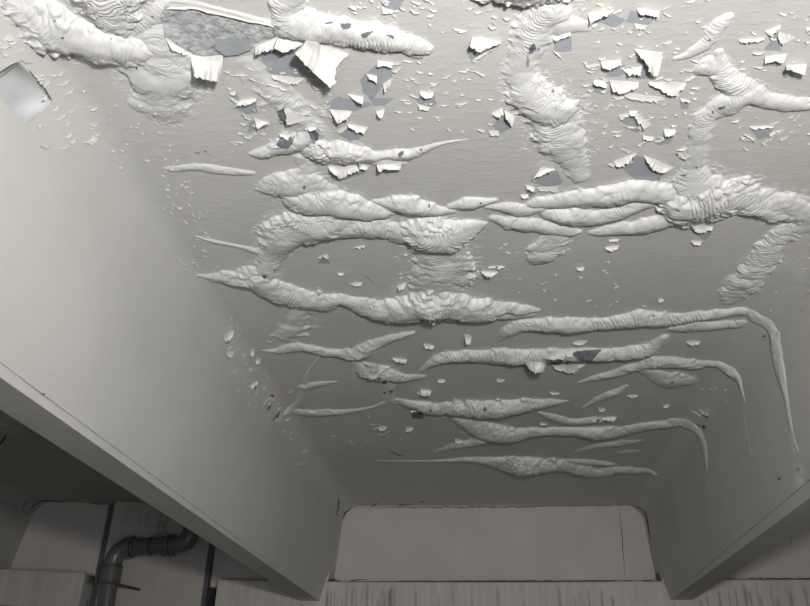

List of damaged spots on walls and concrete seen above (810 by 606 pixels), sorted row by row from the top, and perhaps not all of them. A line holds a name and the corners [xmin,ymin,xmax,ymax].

peeling [580,0,671,36]
peeling [552,32,572,58]
peeling [161,0,515,149]
peeling [583,41,701,181]
peeling [732,113,802,151]
peeling [328,163,401,180]
peeling [520,168,563,199]
crack [0,362,278,569]